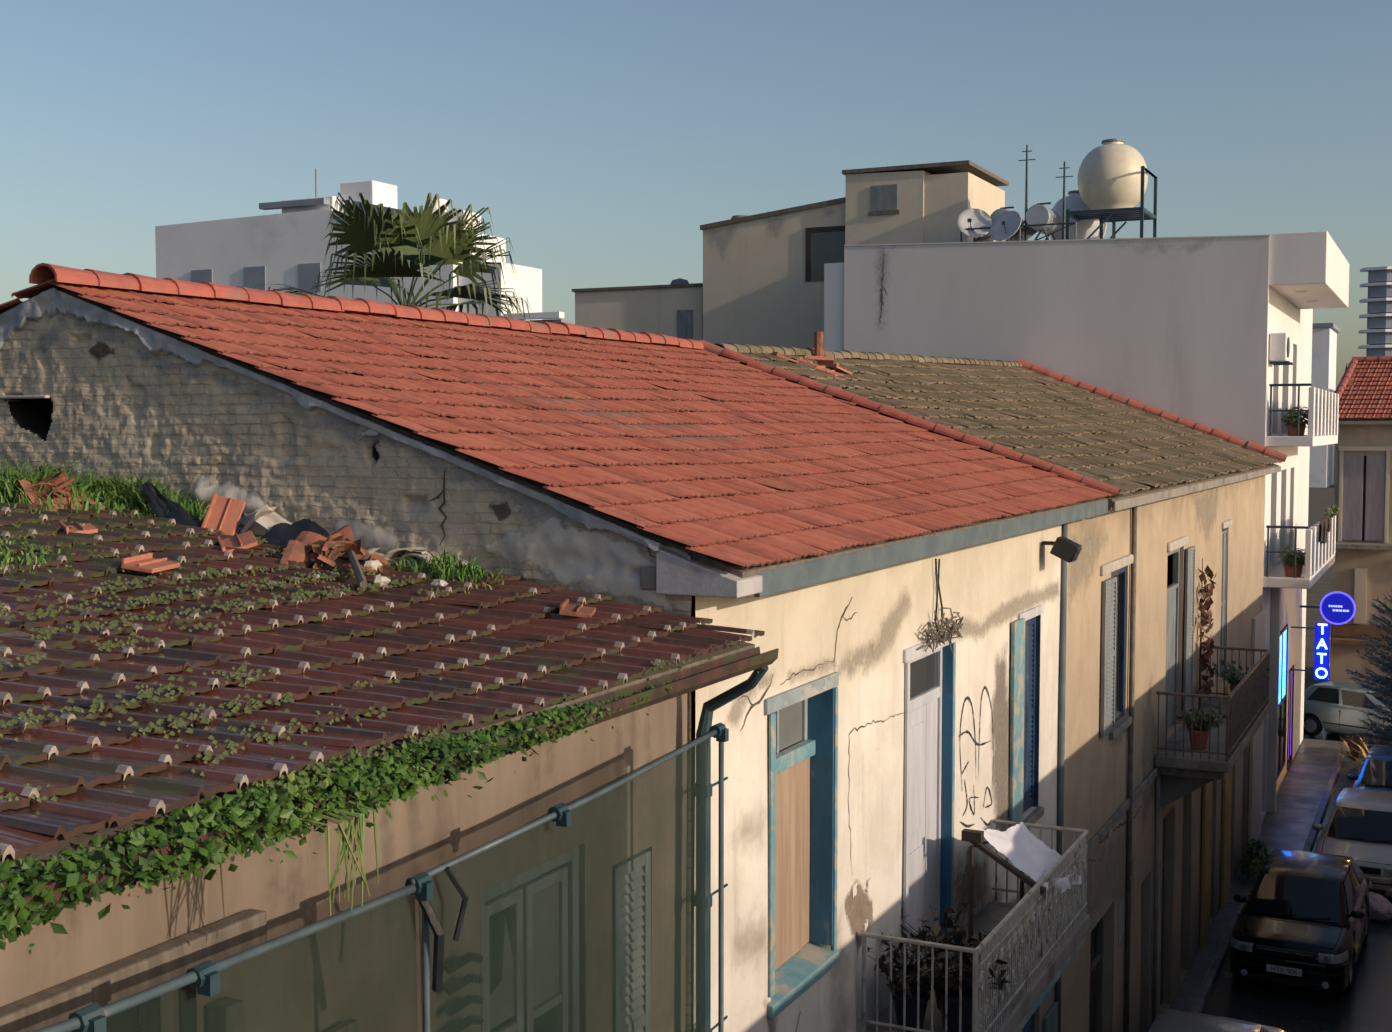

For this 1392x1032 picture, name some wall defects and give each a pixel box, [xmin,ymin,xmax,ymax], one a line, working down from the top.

crack [879,248,888,322]
spalling [0,395,53,441]
crack [430,469,447,545]
crack [739,598,858,731]
damp [848,599,909,673]
crack [848,713,904,866]
flaking render [845,878,873,950]